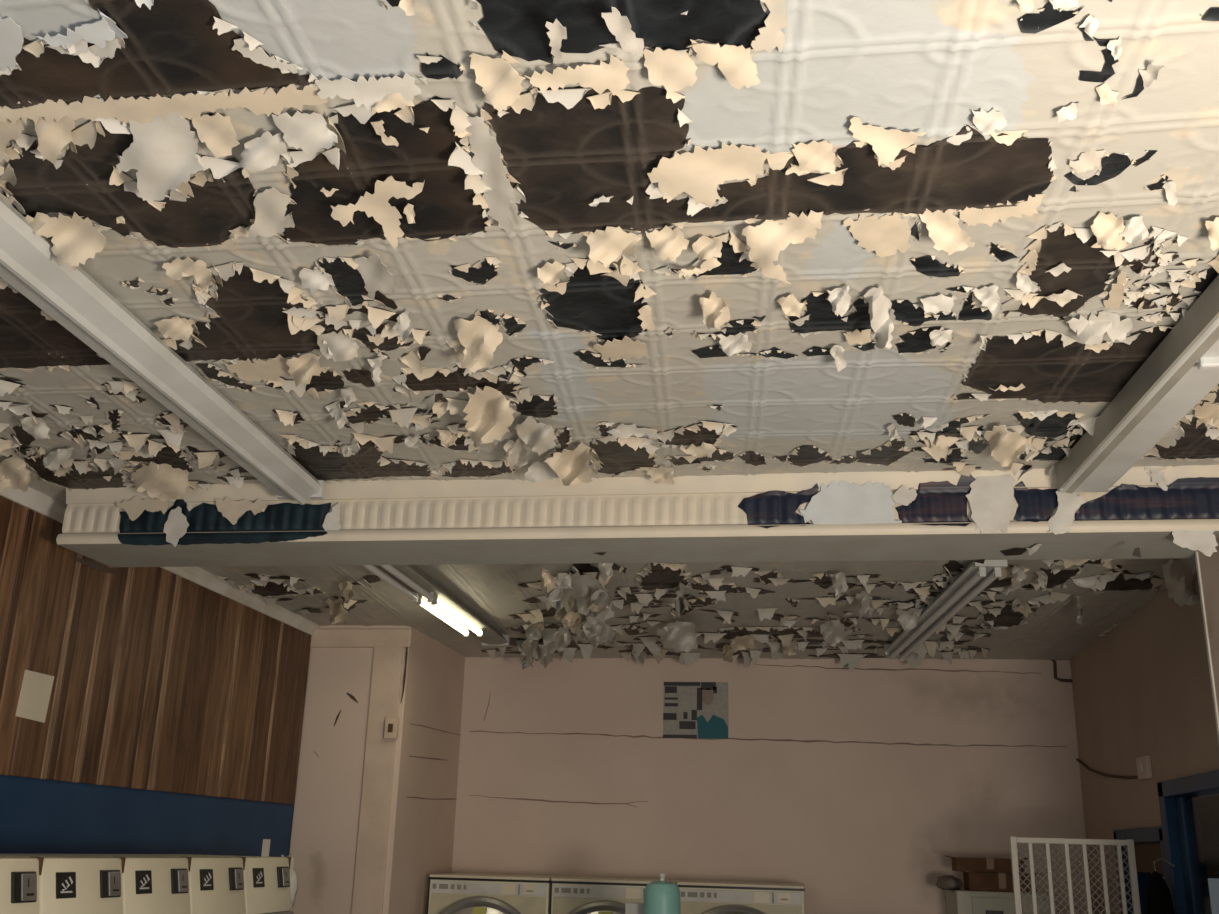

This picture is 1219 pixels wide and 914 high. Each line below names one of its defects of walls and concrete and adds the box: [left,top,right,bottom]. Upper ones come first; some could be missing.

peeling [0,0,1219,672]
crack [401,647,1067,761]